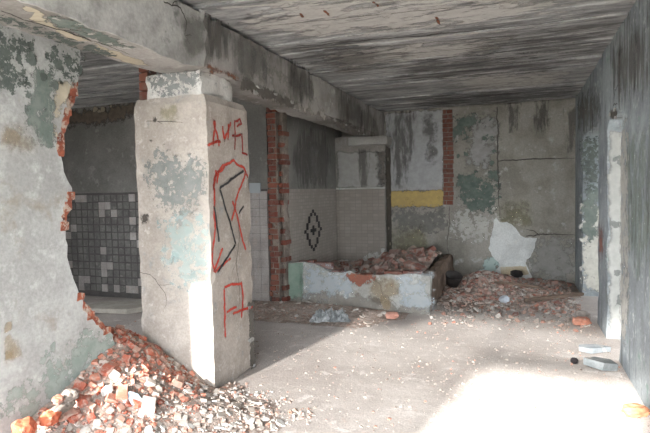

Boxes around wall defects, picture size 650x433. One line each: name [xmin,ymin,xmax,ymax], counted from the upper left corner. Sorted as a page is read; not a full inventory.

peeling [0,6,148,157]
flaking render [346,273,376,287]
leakage [392,111,414,185]
leakage [423,114,437,160]
crack [301,15,603,216]
peeling [375,109,537,279]
peeling [579,108,630,340]